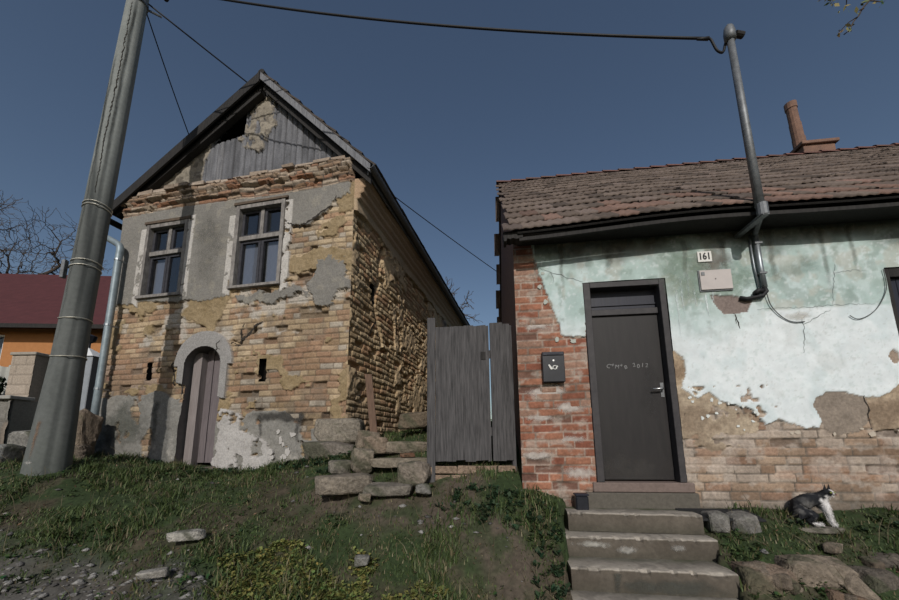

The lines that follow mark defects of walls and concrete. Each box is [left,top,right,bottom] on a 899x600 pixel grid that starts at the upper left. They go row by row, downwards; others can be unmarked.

spalling [159,136,221,189]
spalling [238,96,278,153]
spalling [94,181,448,471]
spalling [710,294,752,315]
crack [760,269,866,351]
spalling [513,245,597,507]
spalling [673,349,899,513]